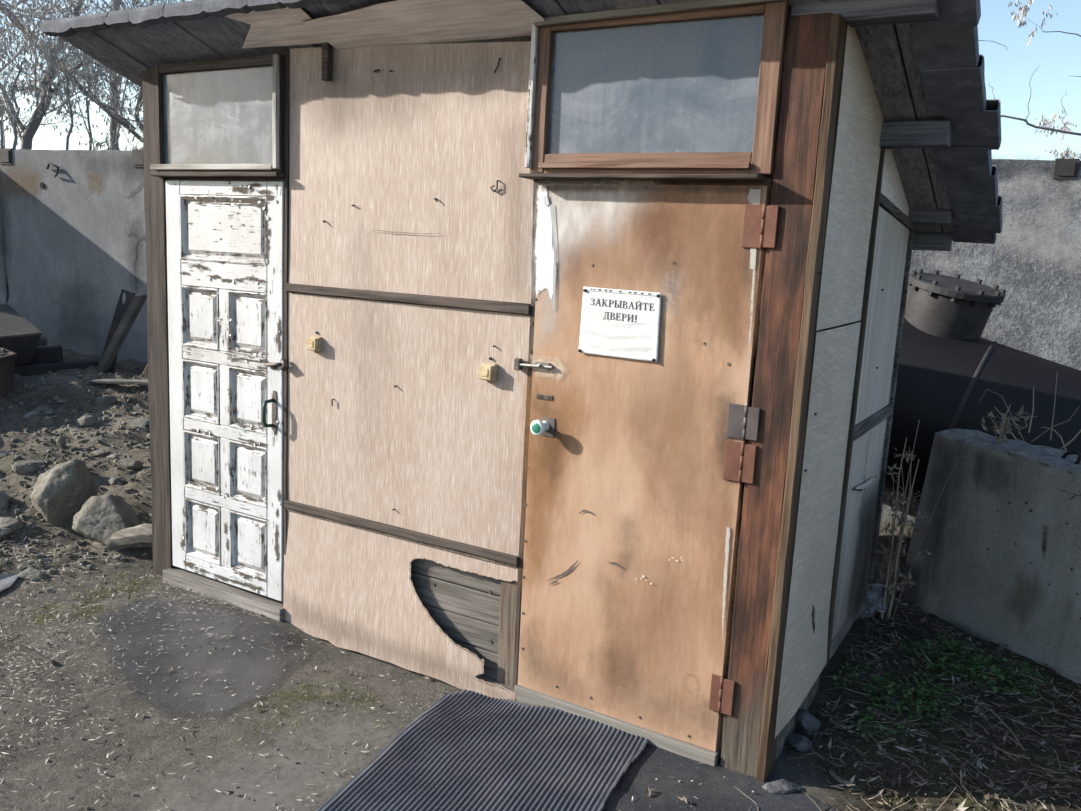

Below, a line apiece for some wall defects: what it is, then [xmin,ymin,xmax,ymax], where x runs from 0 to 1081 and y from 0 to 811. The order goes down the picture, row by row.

peeling [181,264,266,285]
peeling [182,183,277,264]
peeling [535,180,653,311]
peeling [215,303,281,363]
peeling [227,390,278,447]